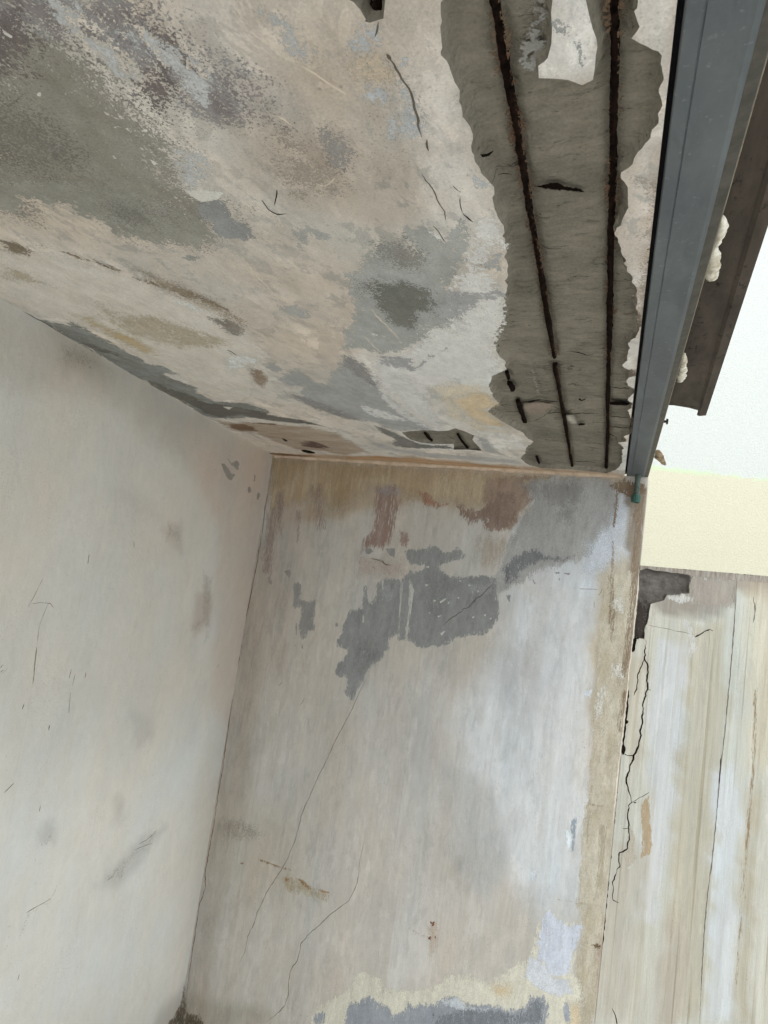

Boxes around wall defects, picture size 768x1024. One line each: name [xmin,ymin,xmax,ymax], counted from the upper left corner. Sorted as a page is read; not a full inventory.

leakage [62,251,269,389]
leakage [0,0,358,284]
crack [374,22,429,151]
corrosion [487,0,552,325]
spalling [440,0,664,473]
corrosion [601,0,630,119]
leakage [261,420,588,576]
peeling [335,544,511,701]
spalling [613,568,694,818]
corrosion [260,859,329,901]
crack [269,844,364,1020]
crack [602,585,756,1006]